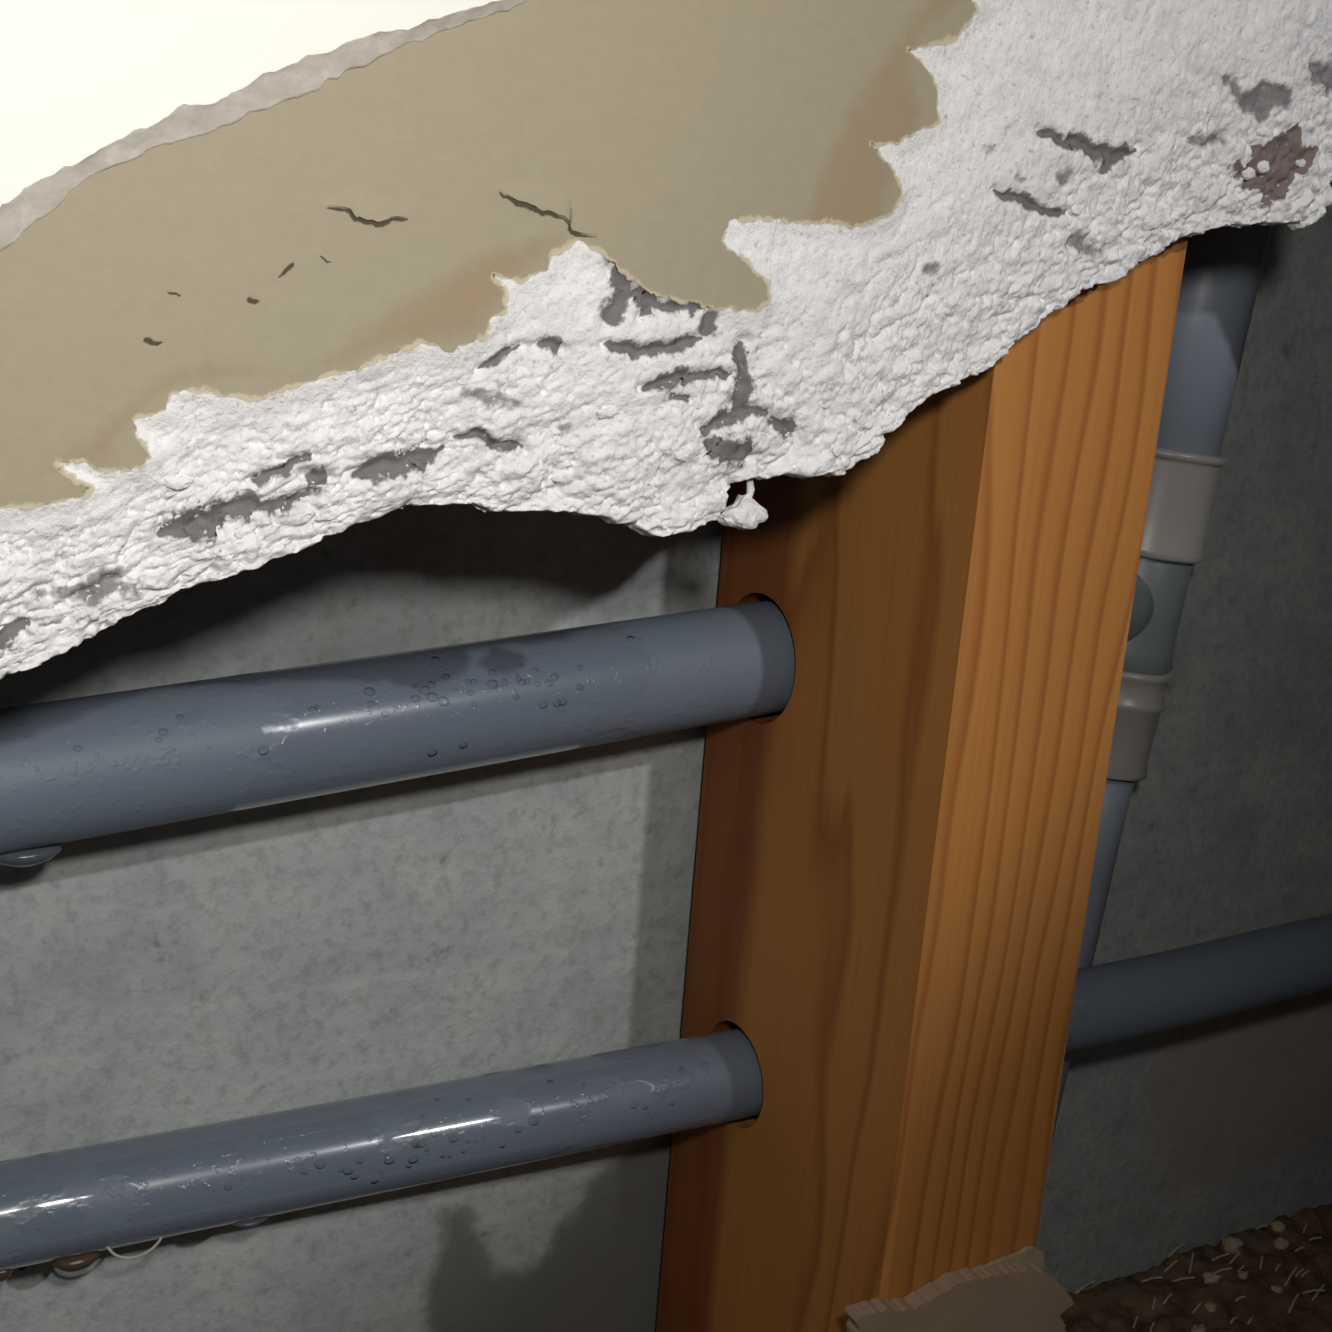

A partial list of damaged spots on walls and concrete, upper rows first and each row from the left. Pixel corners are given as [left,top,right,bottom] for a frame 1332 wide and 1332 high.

flaking render [0,0,1332,680]
damp [1228,123,1319,209]